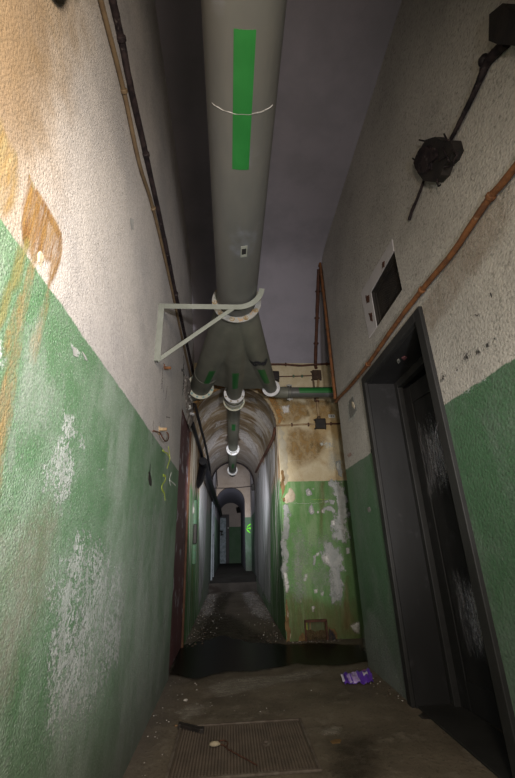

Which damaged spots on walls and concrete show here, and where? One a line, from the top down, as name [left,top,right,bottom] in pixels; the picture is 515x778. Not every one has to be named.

rust [0,182,62,348]
leakage [239,389,333,463]
peeling [306,460,351,603]